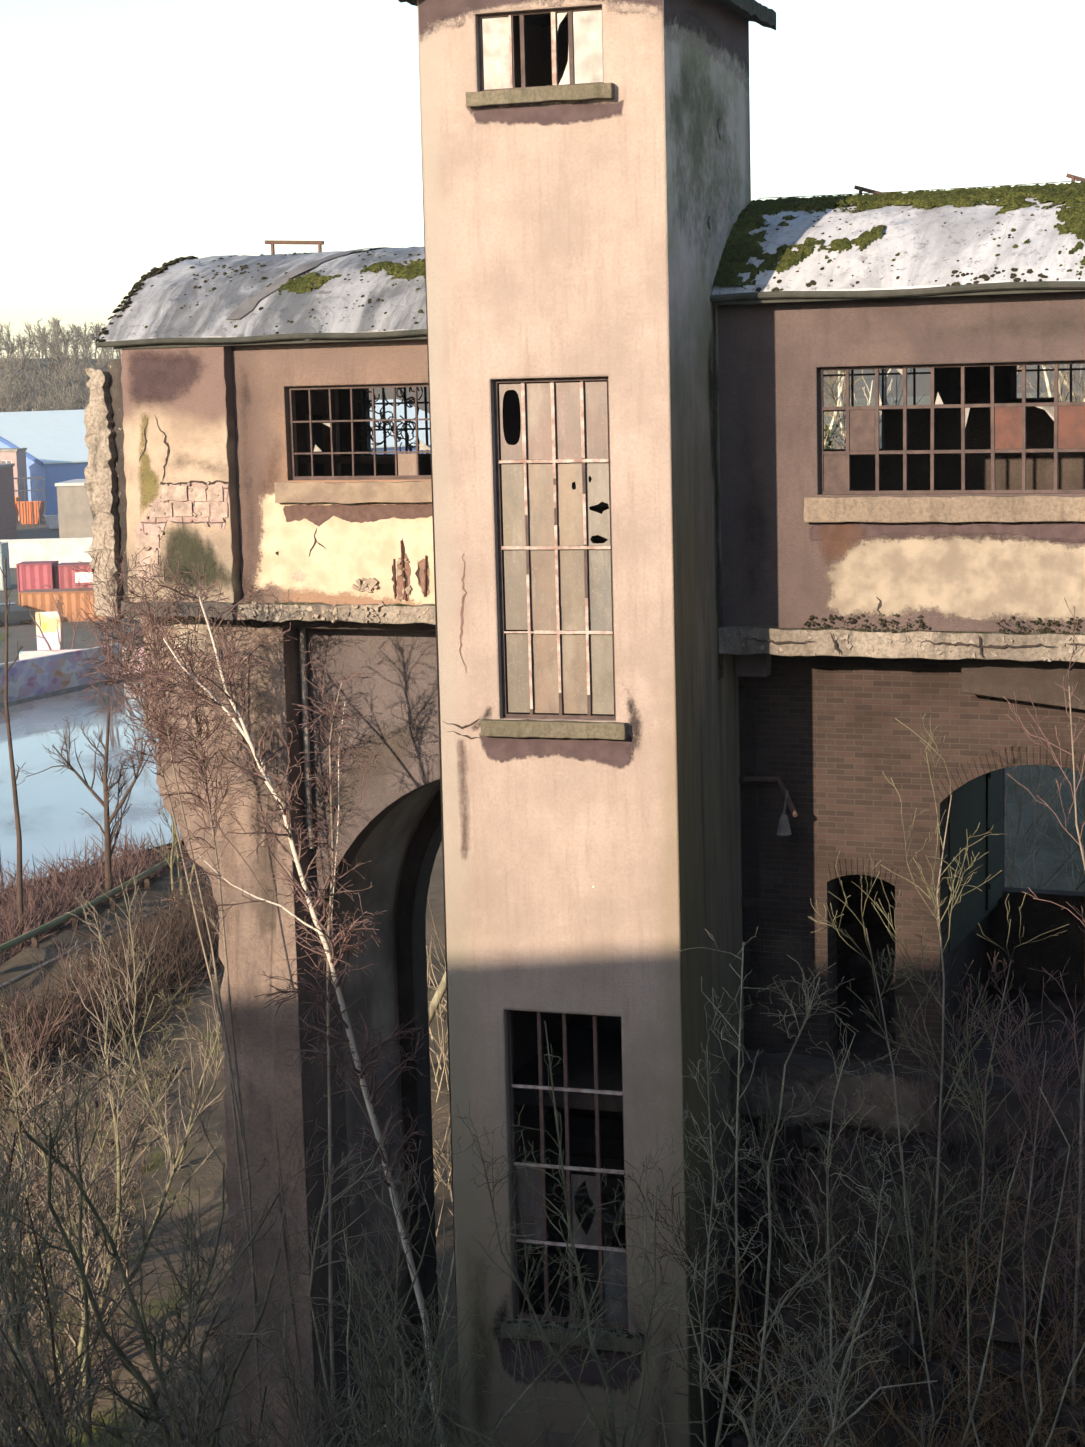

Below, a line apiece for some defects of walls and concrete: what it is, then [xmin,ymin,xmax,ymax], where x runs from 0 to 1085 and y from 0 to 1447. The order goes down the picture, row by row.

damp [131,352,198,402]
crack [139,417,229,485]
peeling [139,481,225,554]
peeling [239,493,436,624]
peeling [827,534,1085,662]
crack [443,719,481,739]
damp [473,701,640,769]
damp [459,741,467,851]
damp [493,1303,642,1393]